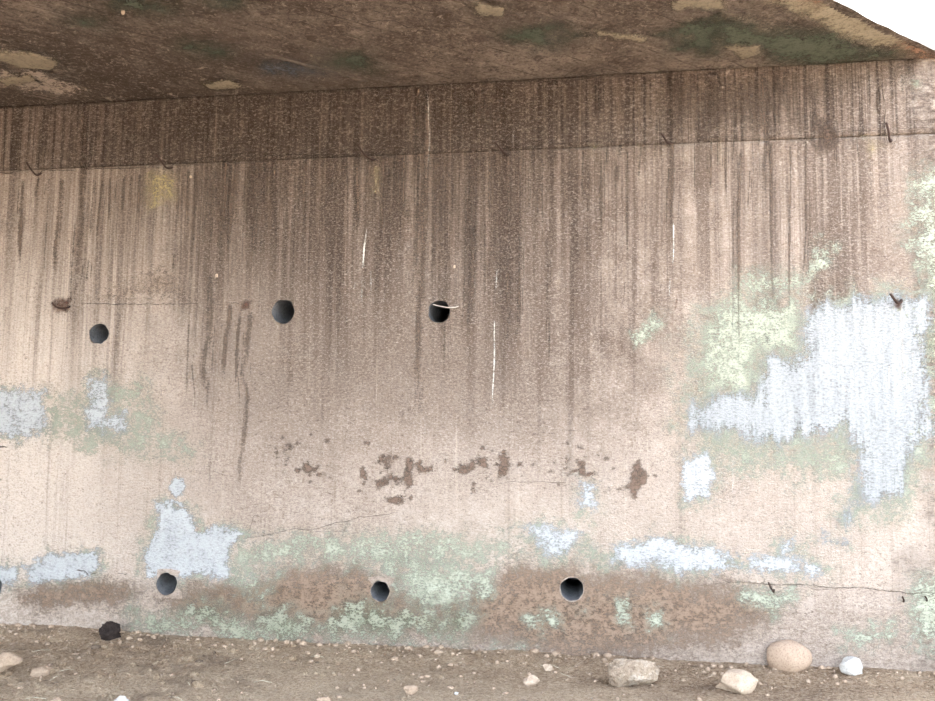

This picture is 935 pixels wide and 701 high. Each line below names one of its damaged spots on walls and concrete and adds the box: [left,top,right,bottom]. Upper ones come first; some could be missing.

damp [668,68,839,331]
rust [53,298,69,311]
peeling [0,383,57,446]
peeling [83,368,132,438]
damp [191,277,252,468]
damp [357,454,433,504]
damp [445,446,534,482]
damp [549,442,595,482]
damp [608,460,657,501]
peeling [136,497,254,587]
damp [158,554,781,658]
crack [700,582,935,596]